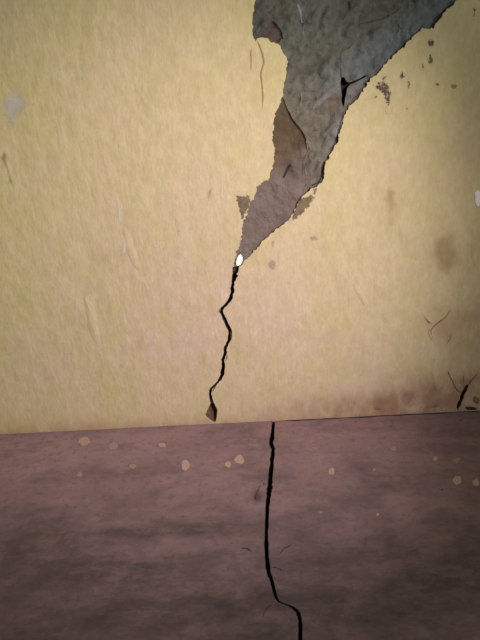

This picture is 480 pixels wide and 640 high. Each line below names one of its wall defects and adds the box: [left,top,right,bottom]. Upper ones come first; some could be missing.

flaking render [234,0,456,267]
crack [206,267,239,422]
crack [245,372,477,640]